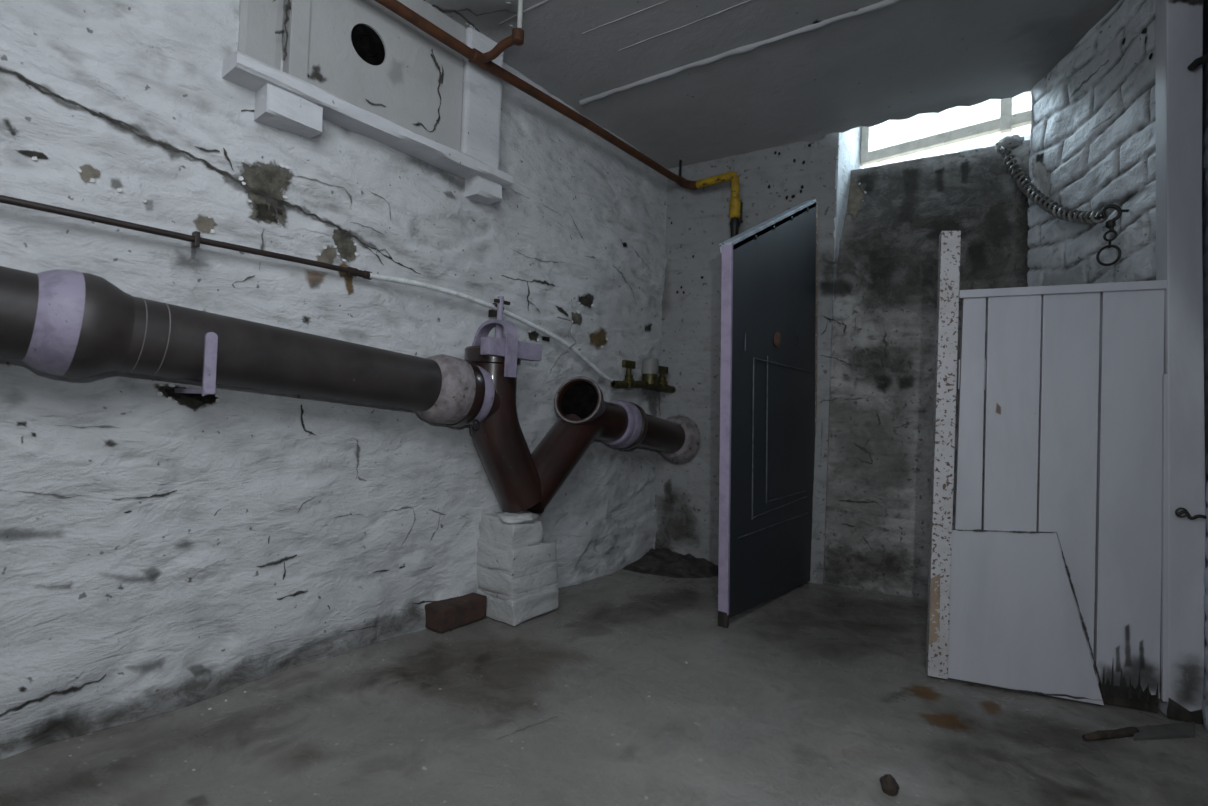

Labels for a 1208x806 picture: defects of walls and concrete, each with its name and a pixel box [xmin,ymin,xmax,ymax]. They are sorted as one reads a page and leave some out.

crack [273,0,291,61]
crack [413,49,444,132]
peeling [76,164,122,192]
peeling [194,215,215,233]
crack [0,67,420,288]
spalling [238,160,294,227]
spalling [317,229,359,265]
leakage [821,158,1031,309]
leakage [1102,625,1160,692]
crack [0,674,106,731]